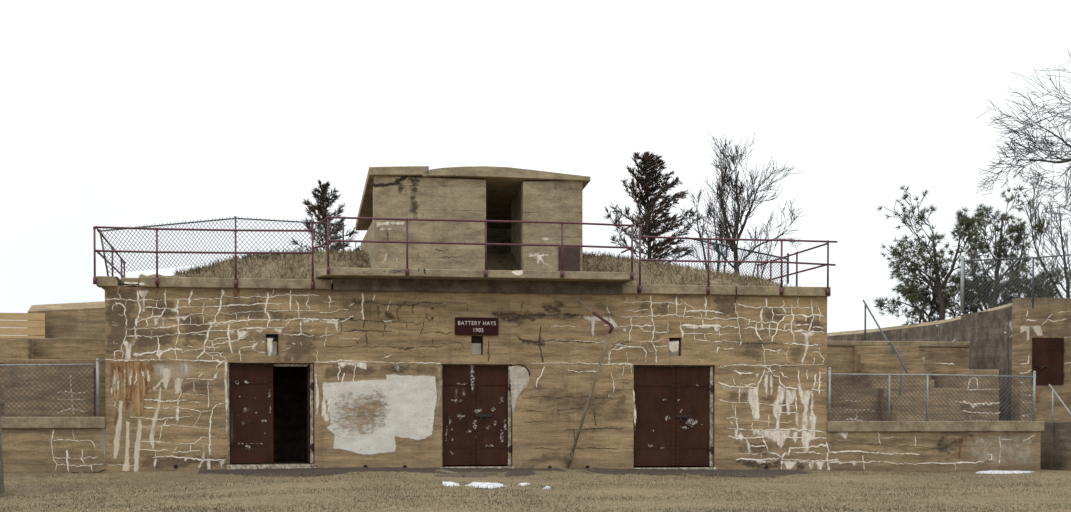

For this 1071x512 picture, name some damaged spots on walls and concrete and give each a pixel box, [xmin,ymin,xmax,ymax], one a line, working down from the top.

corrosion [108,361,153,422]
damp [102,288,228,472]
damp [225,297,338,361]
peeling [315,373,326,421]
damp [325,362,373,378]
damp [723,373,856,470]
damp [791,318,822,363]